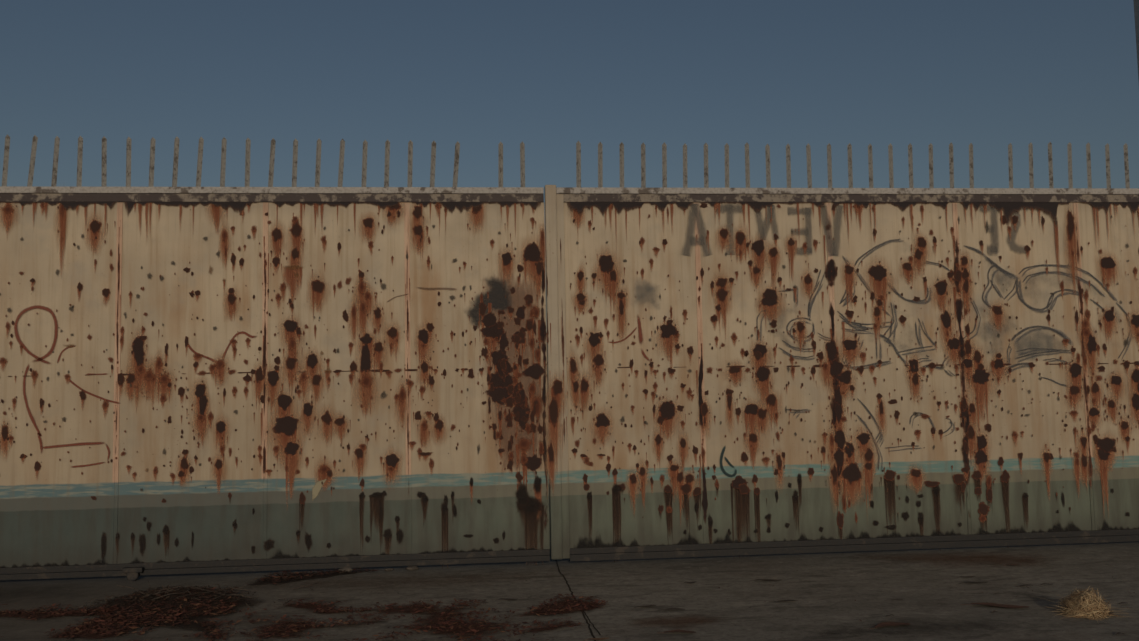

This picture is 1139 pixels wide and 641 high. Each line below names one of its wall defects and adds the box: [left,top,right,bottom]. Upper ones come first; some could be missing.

rust [0,202,1139,569]
crack [555,560,601,641]